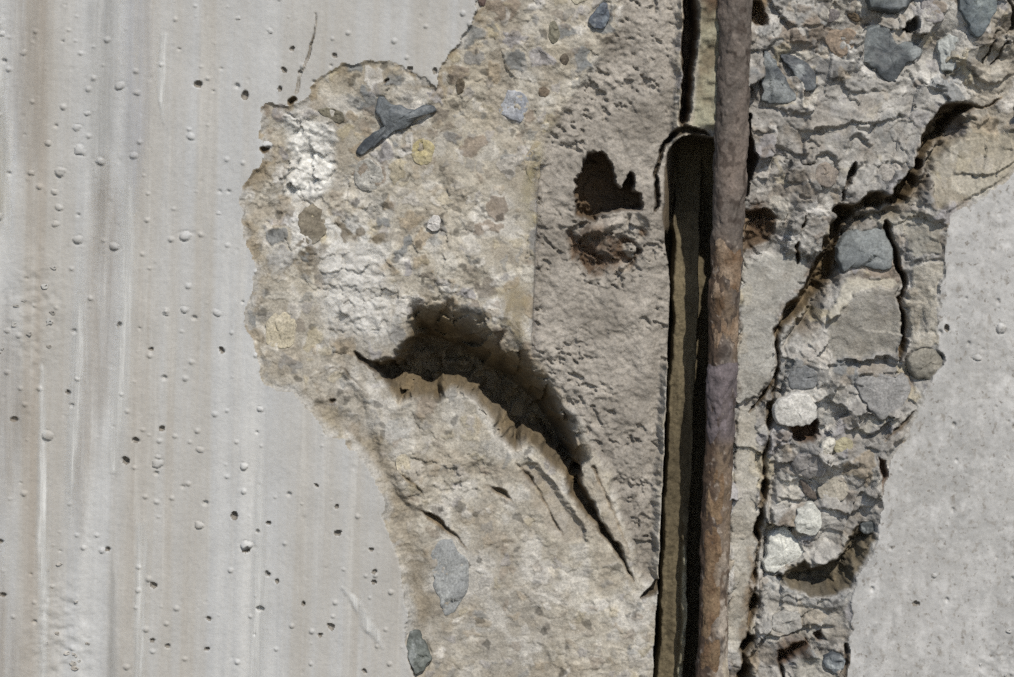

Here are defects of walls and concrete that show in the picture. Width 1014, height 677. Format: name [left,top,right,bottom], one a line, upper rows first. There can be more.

crack [652,0,711,213]
crack [981,0,1014,68]
spalling [239,0,720,677]
corrosion [711,238,743,348]
spalling [705,0,1014,677]
crack [734,95,1003,677]
crack [399,474,470,552]
crack [484,461,639,590]
corrosion [700,470,724,673]